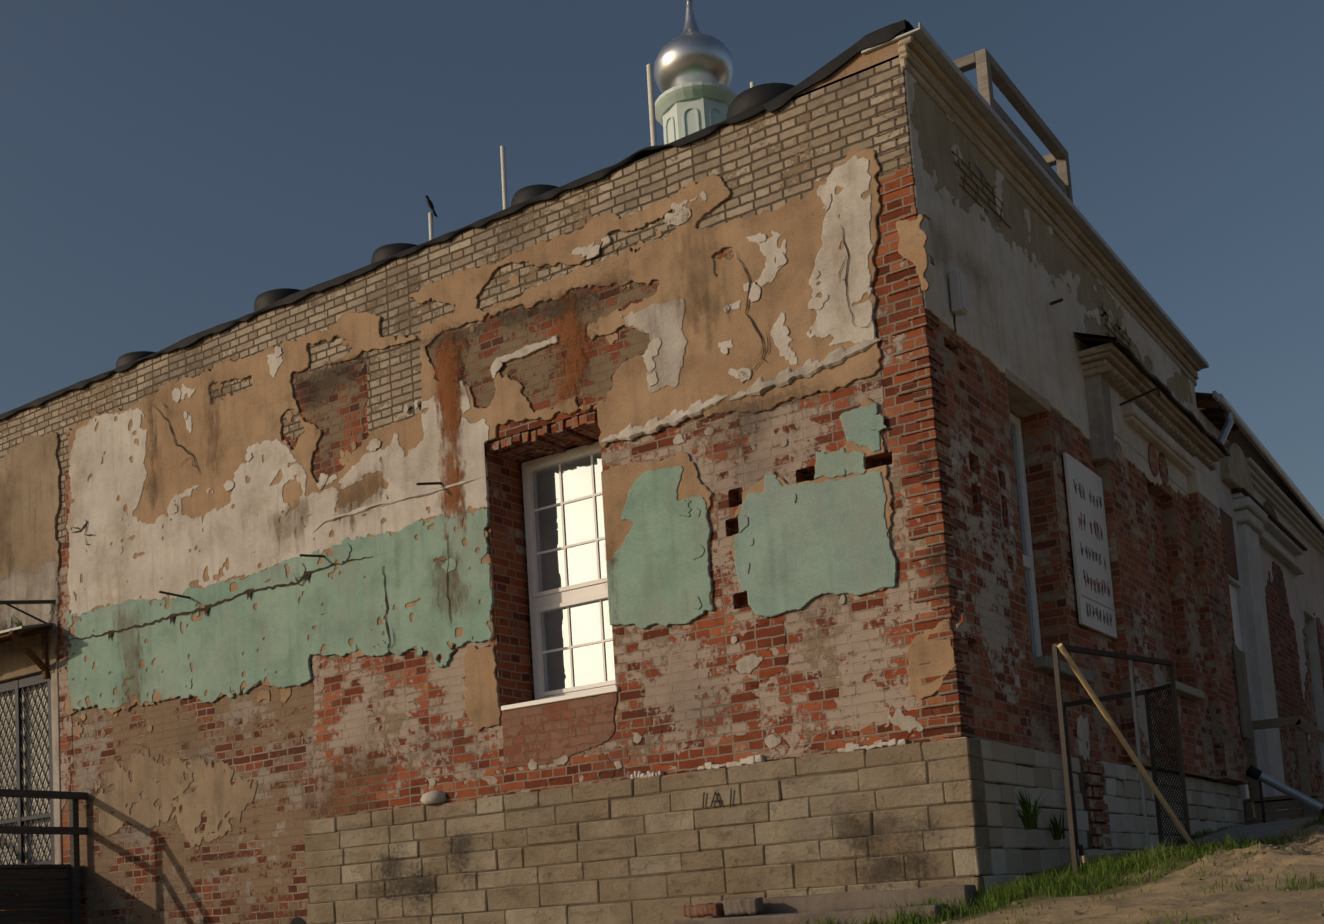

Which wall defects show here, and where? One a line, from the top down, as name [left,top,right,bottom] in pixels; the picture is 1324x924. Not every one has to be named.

crack [737,255,768,372]
peeling [771,155,876,365]
peeling [910,82,1152,372]
crack [67,556,394,670]
flaking render [0,191,1032,924]
peeling [1075,709,1090,761]
peeling [1128,589,1168,762]
flaking render [1265,561,1324,819]